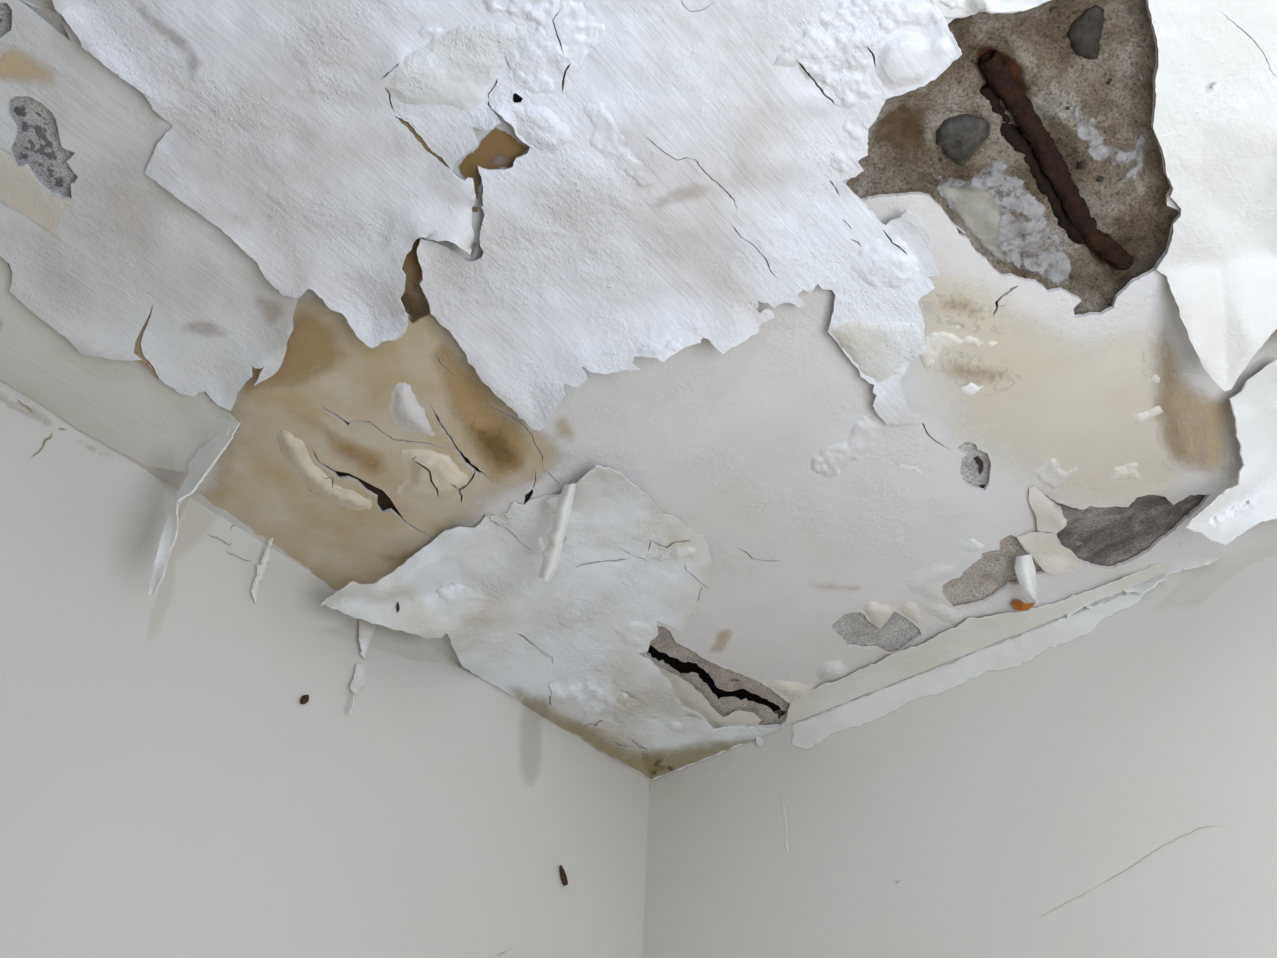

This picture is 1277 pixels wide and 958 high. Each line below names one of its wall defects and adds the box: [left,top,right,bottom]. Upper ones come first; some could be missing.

crack [325,465,402,517]
damp [204,239,555,589]
peeling [0,0,1277,603]
crack [647,645,780,712]
peeling [320,359,1277,780]